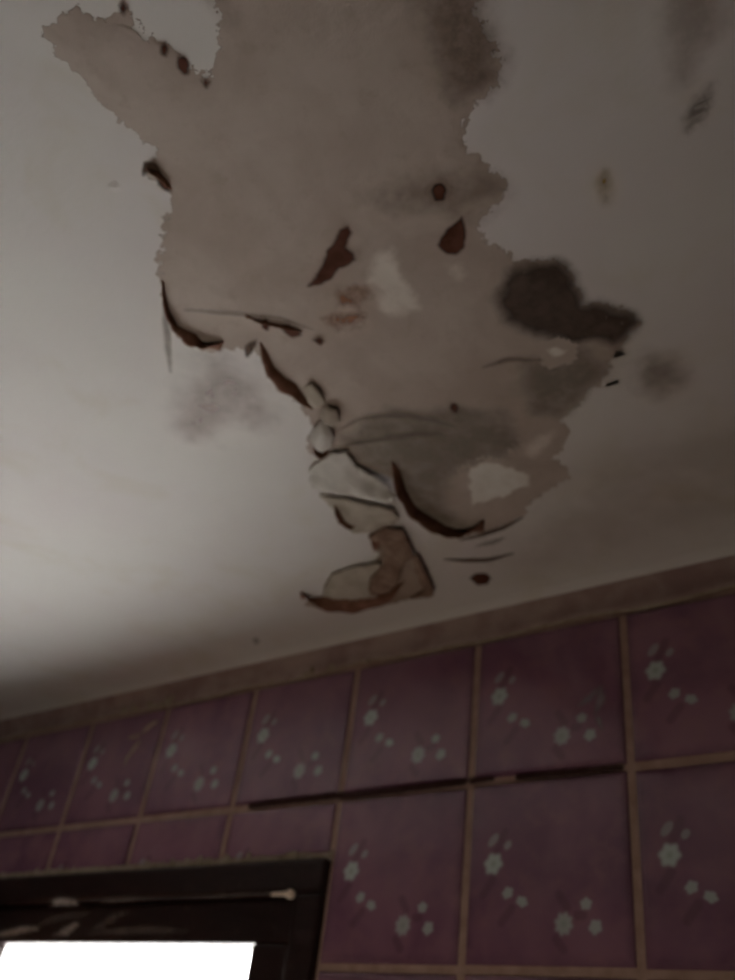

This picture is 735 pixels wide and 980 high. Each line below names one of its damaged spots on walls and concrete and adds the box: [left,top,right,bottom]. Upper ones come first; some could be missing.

flaking render [41,0,643,614]
crack [248,765,624,809]